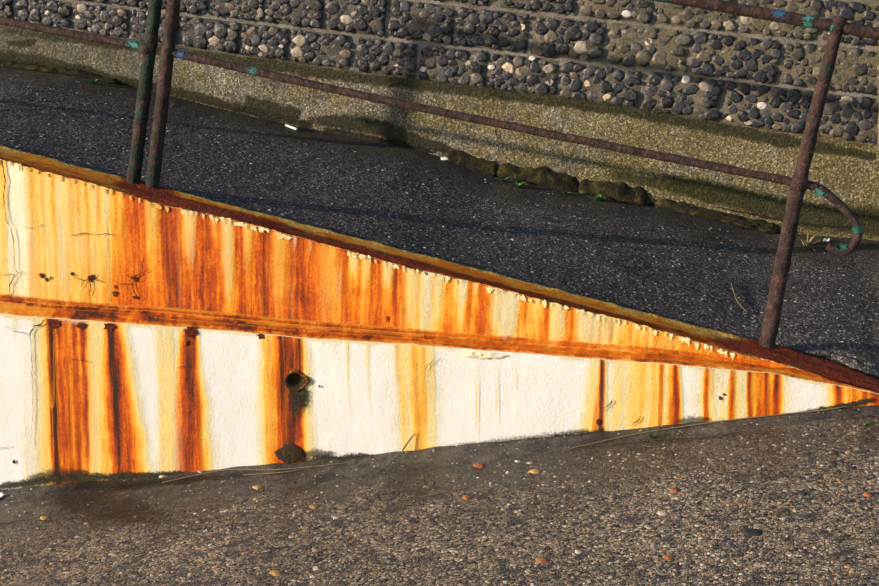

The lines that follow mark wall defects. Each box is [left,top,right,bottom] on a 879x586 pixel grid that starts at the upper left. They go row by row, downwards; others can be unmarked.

crack [1,158,44,293]
corrosion [0,149,879,486]
peeling [485,287,735,359]
spalling [274,444,306,464]